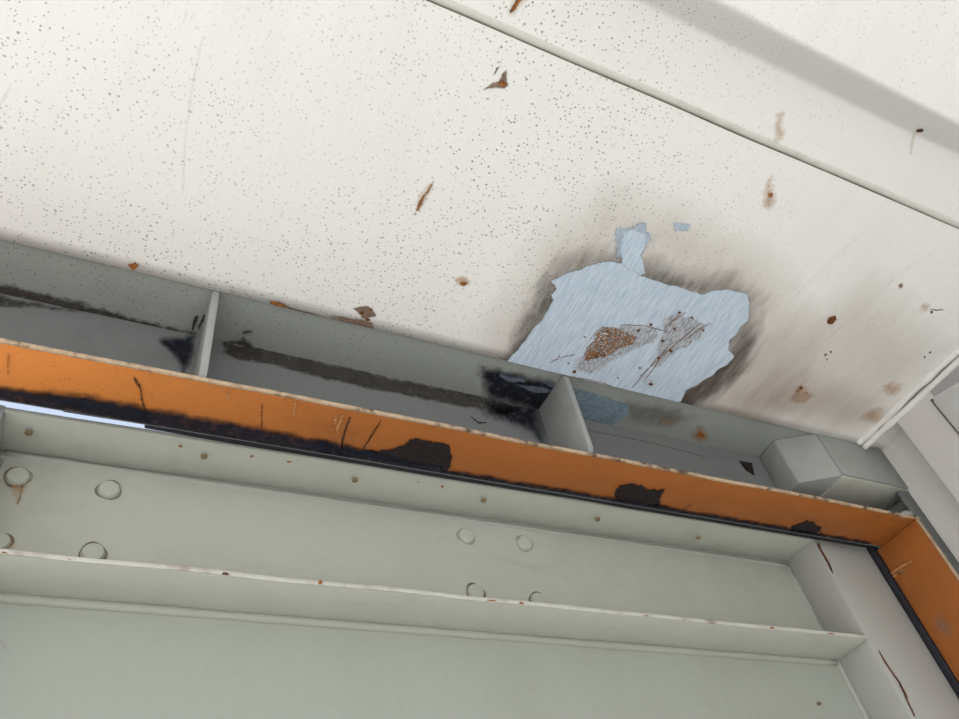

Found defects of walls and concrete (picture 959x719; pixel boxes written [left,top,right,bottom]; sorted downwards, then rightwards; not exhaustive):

corrosion [584,323,652,361]
peeling [364,438,453,471]
peeling [614,483,664,506]